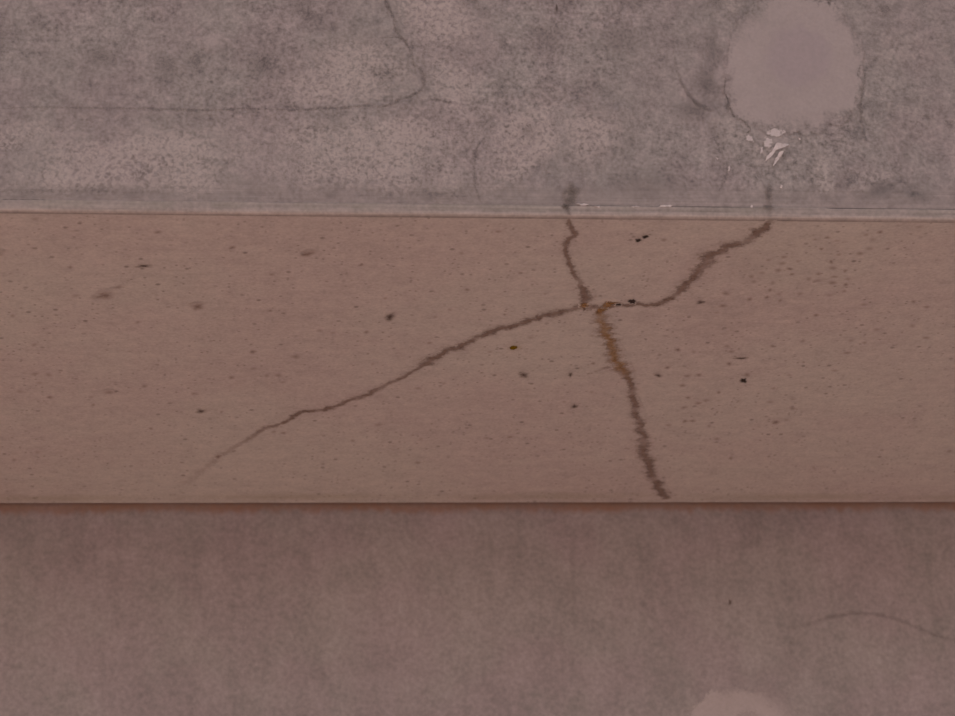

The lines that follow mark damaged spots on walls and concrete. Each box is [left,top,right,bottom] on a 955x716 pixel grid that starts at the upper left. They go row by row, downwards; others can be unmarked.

spalling [746,128,801,166]
crack [176,219,777,500]